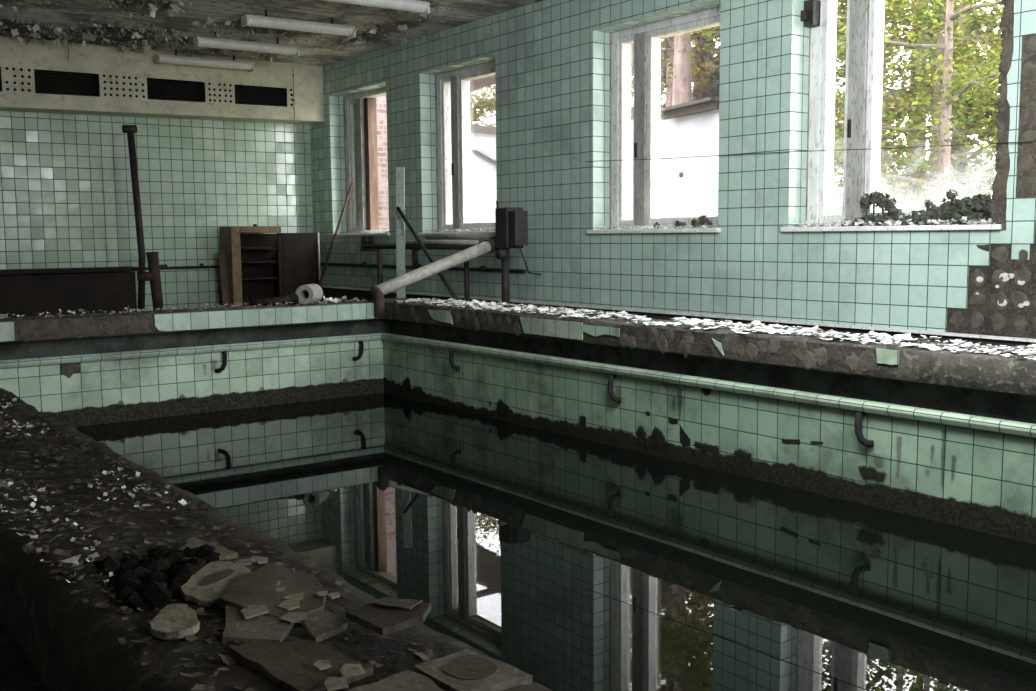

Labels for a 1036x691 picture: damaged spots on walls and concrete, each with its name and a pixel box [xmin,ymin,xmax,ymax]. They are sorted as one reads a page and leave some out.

peeling [0,0,454,63]
spalling [991,0,1036,230]
peeling [946,225,1036,349]
peeling [60,363,80,378]
spalling [668,417,691,446]
spalling [149,536,552,691]